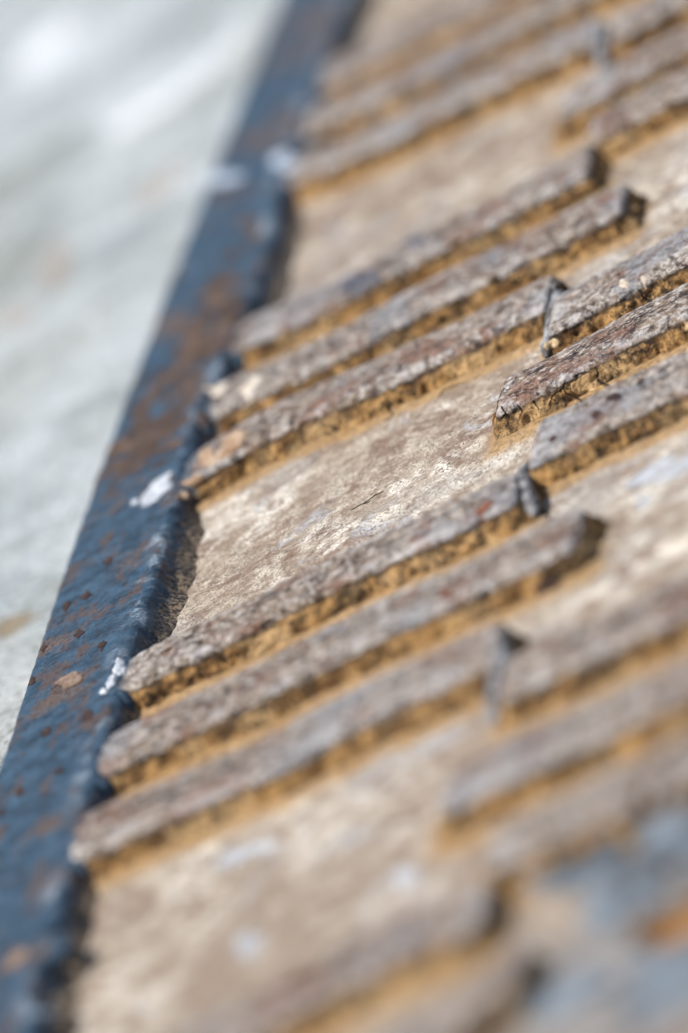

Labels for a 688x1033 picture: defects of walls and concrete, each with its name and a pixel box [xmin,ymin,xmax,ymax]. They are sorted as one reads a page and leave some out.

rust [54,671,82,689]